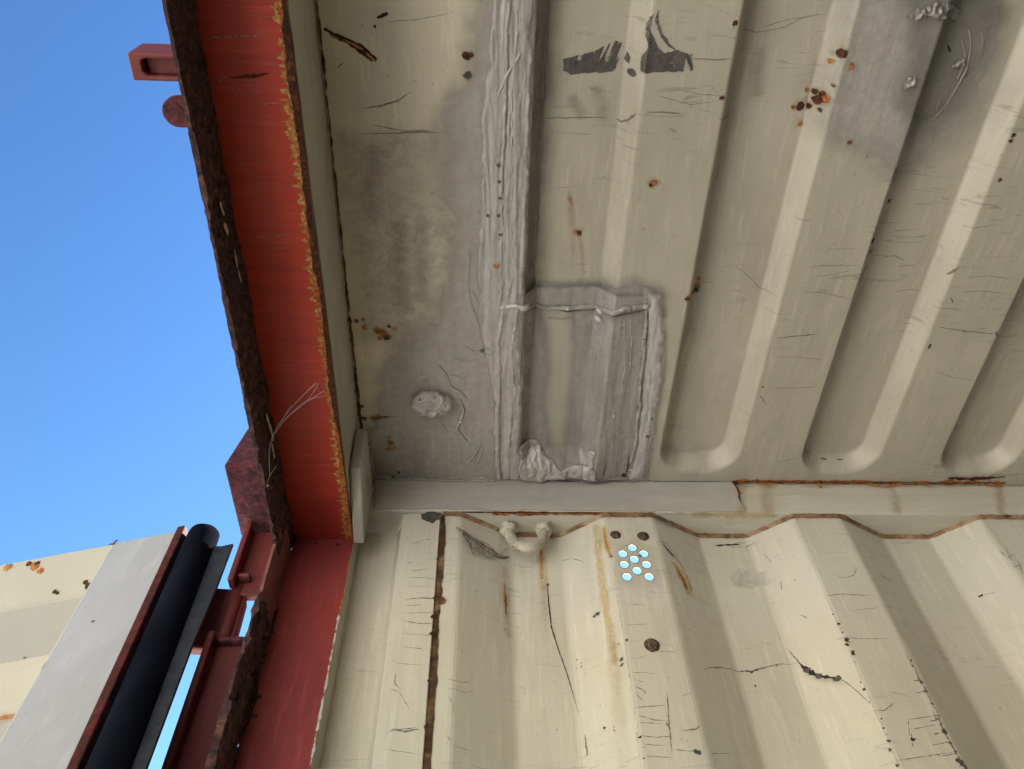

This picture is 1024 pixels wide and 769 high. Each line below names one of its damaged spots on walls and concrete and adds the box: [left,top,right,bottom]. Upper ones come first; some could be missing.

peeling [563,10,693,77]
rust [827,48,854,70]
rust [791,84,836,126]
rust [316,0,400,430]
rust [270,0,353,546]
rust [732,476,1005,488]
rust [26,561,44,574]
rust [658,541,692,593]
rust [423,511,449,769]
crack [546,583,579,713]
crack [717,650,867,701]